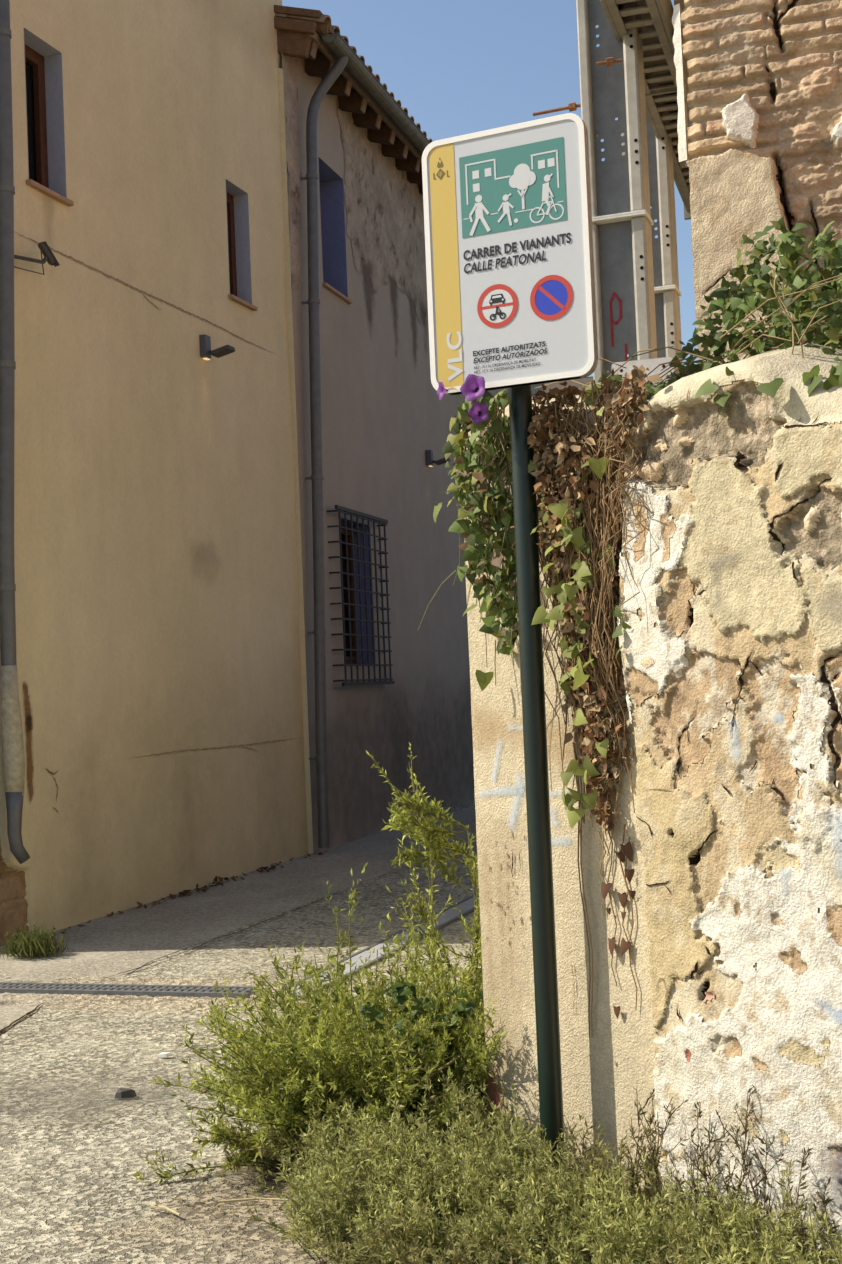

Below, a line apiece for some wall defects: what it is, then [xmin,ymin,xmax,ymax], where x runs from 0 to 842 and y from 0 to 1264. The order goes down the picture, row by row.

crack [766,0,797,101]
crack [776,159,825,292]
crack [125,738,298,759]
crack [820,651,842,791]
peeling [617,380,842,1264]
crack [656,945,711,1019]